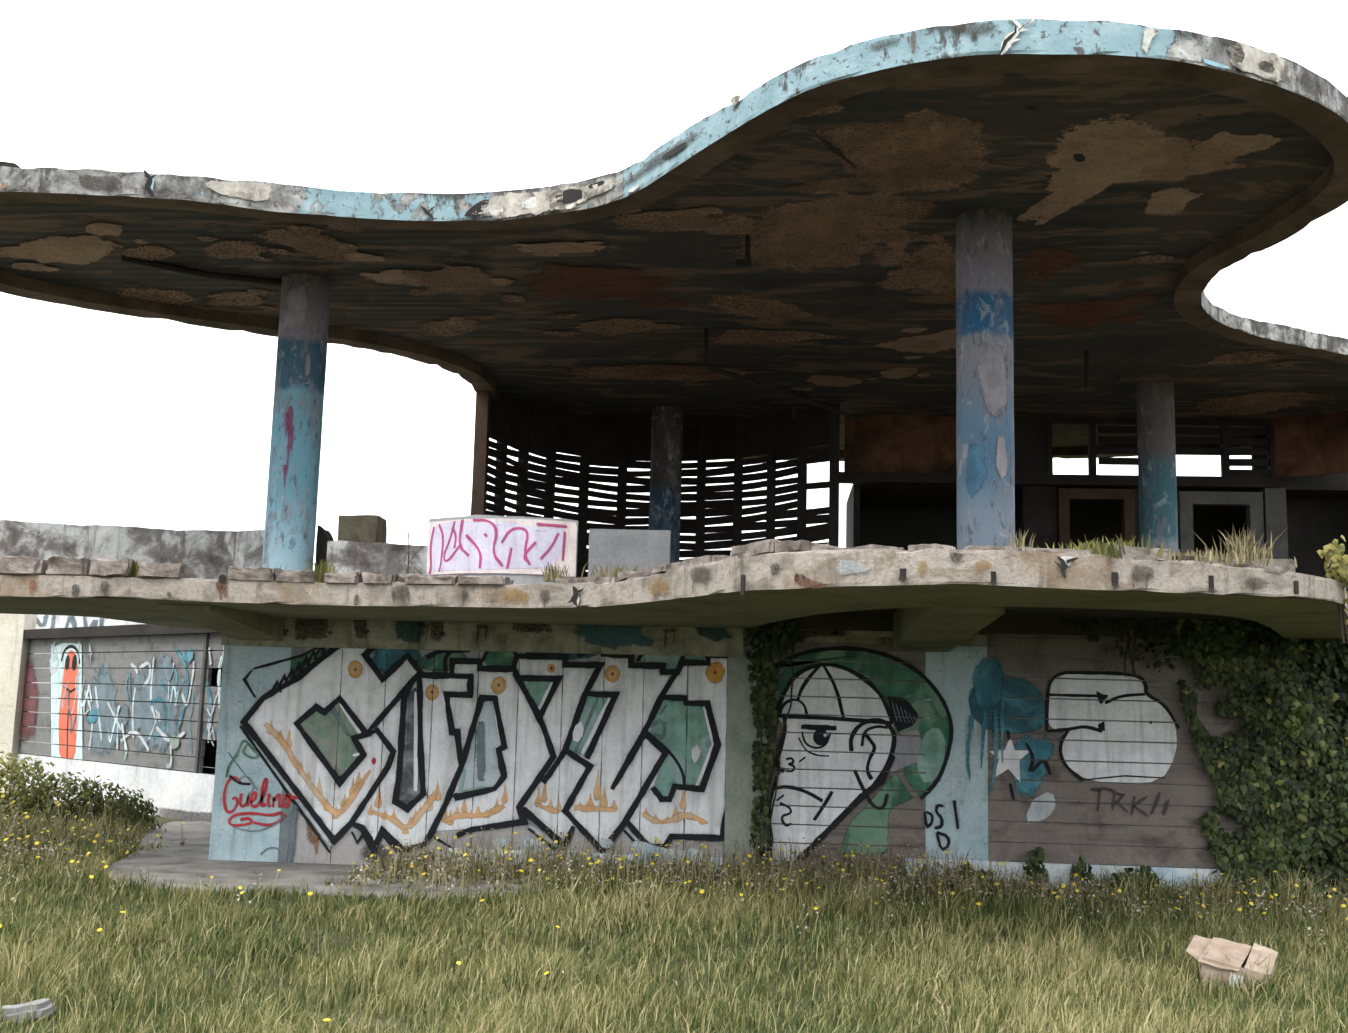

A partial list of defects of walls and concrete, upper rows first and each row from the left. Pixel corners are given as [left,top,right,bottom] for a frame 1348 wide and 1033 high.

peeling [1142,26,1158,54]
peeling [1204,42,1327,95]
spalling [464,132,700,219]
peeling [1017,113,1282,225]
peeling [0,222,175,272]
peeling [195,225,526,303]
peeling [511,242,607,256]
peeling [416,315,495,337]
peeling [977,344,1007,418]
peeling [966,436,1008,498]
spalling [794,573,825,589]